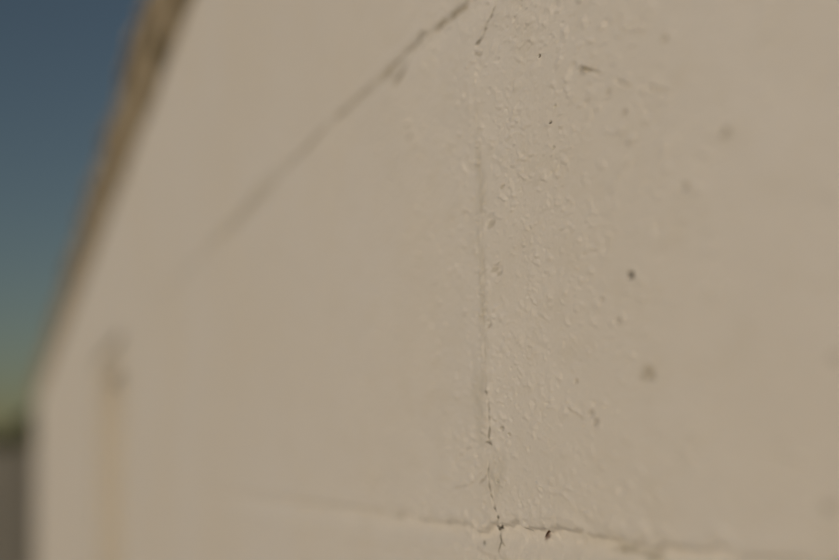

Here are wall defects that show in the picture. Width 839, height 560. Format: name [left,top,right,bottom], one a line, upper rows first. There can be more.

crack [479,352,505,552]